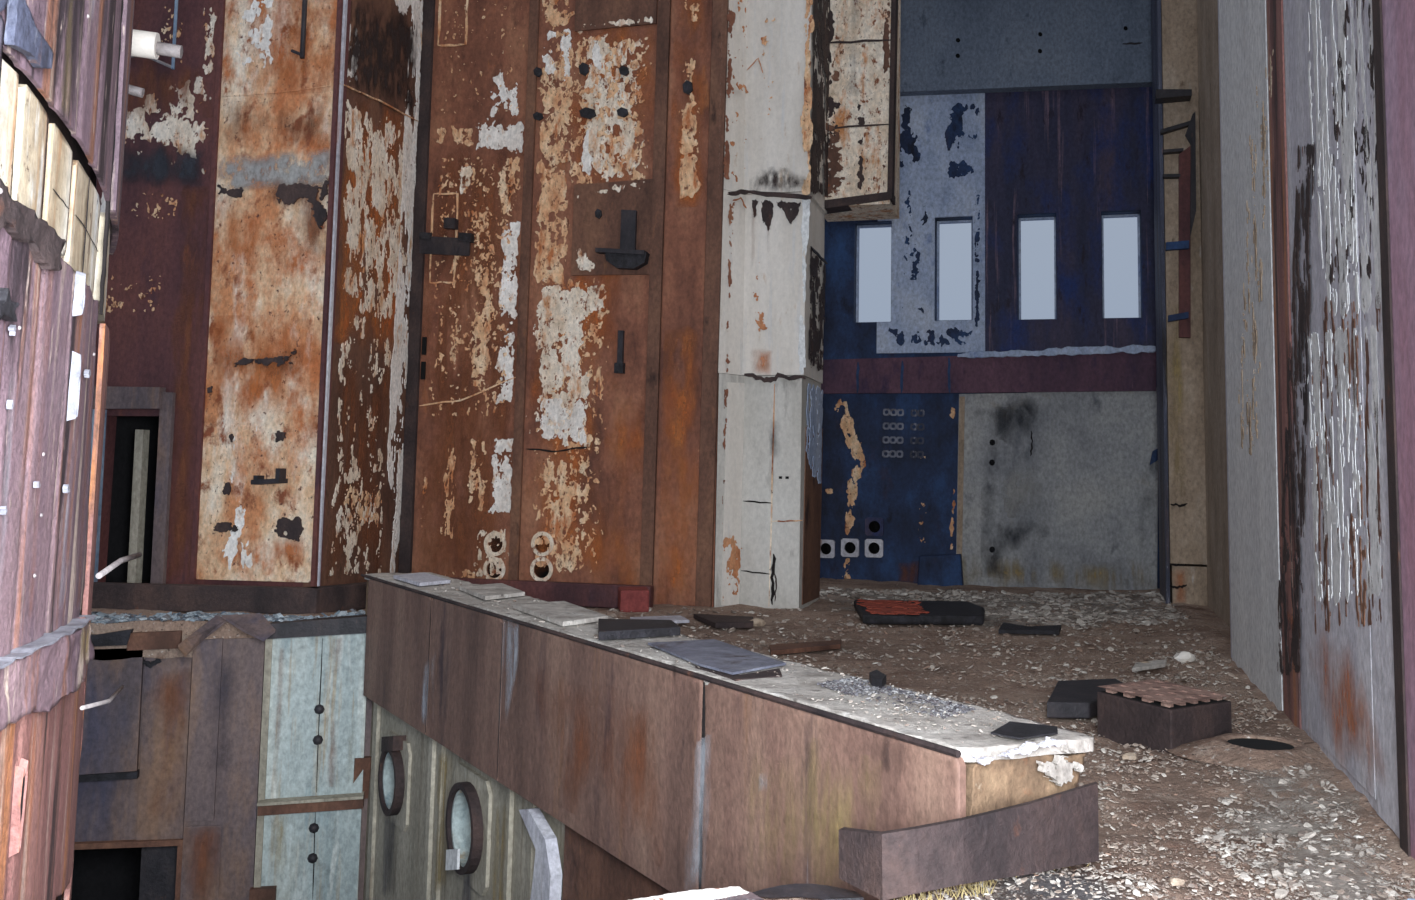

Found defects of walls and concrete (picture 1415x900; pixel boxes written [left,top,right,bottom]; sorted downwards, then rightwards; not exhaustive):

peeling [125,6,217,174]
peeling [236,0,274,68]
peeling [131,193,178,219]
peeling [224,153,328,189]
peeling [330,0,423,576]
rust [433,165,515,567]
peeling [422,0,653,578]
rust [578,278,606,353]
peeling [222,501,253,570]
rust [547,419,599,560]
peeling [806,383,866,535]
spalling [972,736,1084,787]